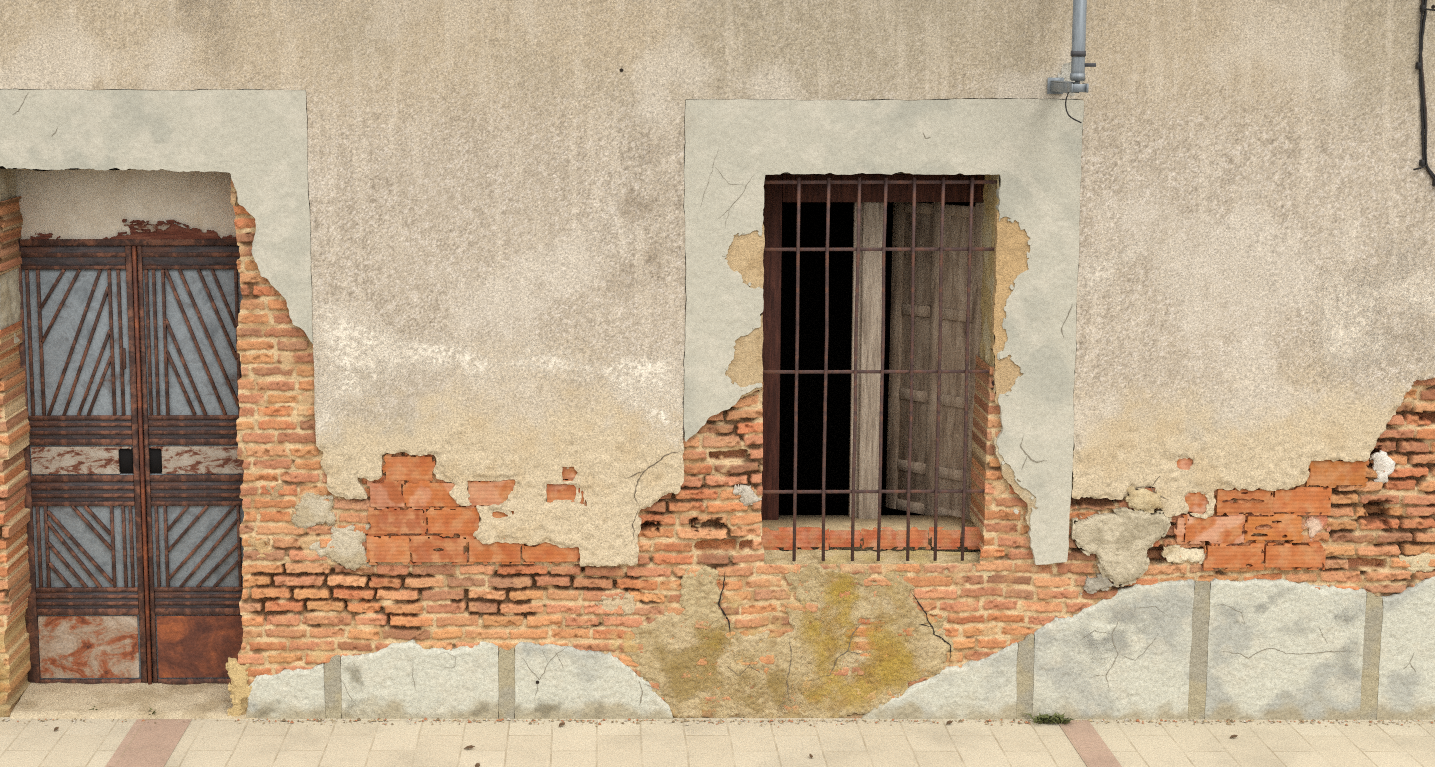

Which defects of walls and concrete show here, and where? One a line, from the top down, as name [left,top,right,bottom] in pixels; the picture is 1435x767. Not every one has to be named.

spalling [0,196,60,275]
spalling [0,320,32,717]
spalling [226,179,1435,719]